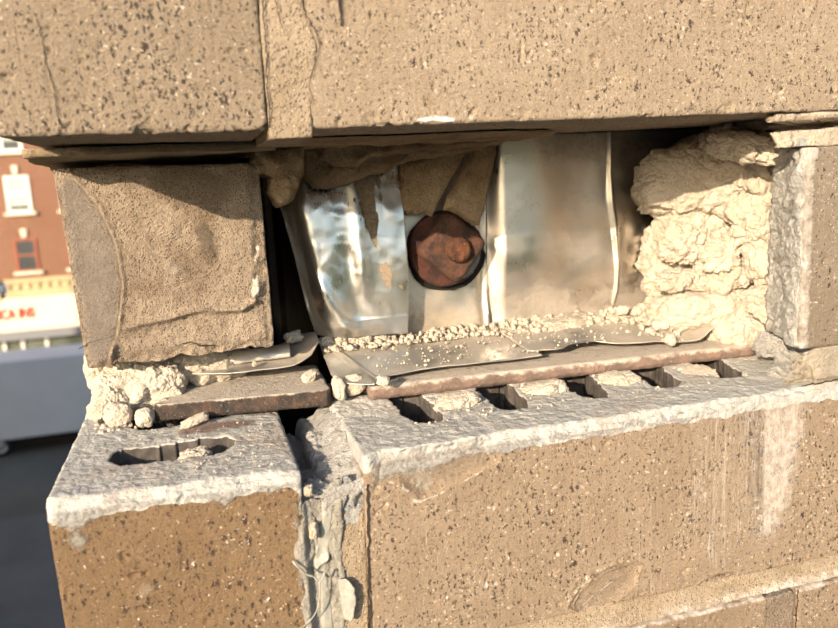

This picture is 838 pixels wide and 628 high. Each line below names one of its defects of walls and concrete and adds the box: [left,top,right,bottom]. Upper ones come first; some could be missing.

crack [36,19,63,129]
crack [262,0,284,128]
crack [303,1,320,125]
damp [748,402,799,527]
crack [365,484,373,628]